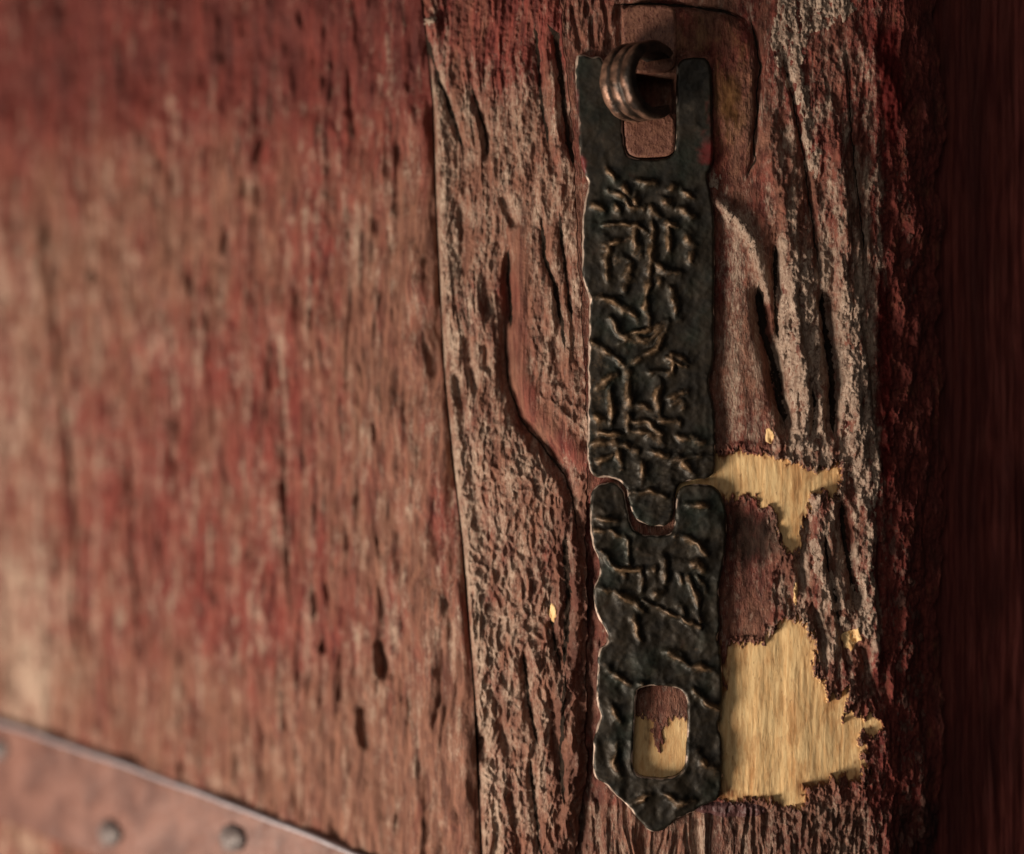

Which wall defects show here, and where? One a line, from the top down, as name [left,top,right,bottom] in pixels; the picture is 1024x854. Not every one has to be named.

crack [616,2,836,436]
peeling [633,710,687,777]
peeling [675,261,926,848]